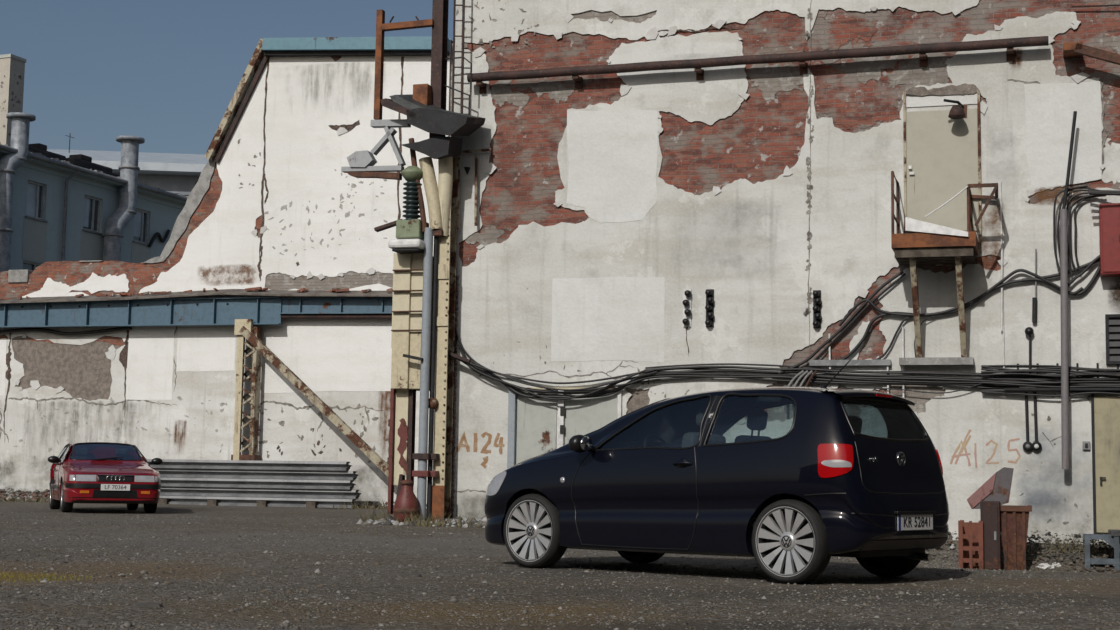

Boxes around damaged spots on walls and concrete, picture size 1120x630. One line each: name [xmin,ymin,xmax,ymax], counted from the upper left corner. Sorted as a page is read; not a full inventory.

flaking render [0,162,222,298]
crack [257,60,269,279]
flaking render [456,0,1120,267]
flaking render [0,333,127,456]
crack [0,326,178,443]
flaking render [625,369,666,414]
flaking render [764,404,795,422]
flaking render [767,255,1008,418]